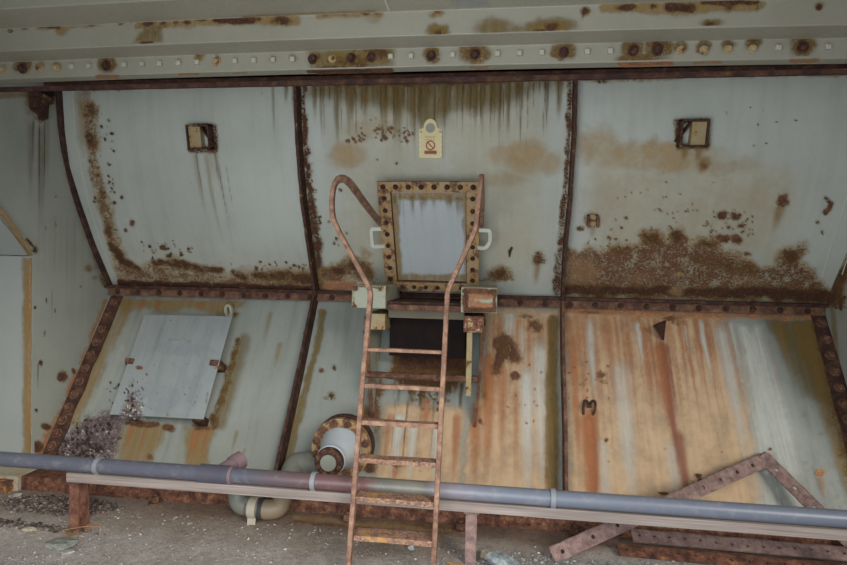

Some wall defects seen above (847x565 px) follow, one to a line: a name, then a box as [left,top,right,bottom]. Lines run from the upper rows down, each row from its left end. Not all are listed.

rust [135,16,299,44]
rust [307,49,394,75]
rust [481,20,572,33]
rust [601,0,763,26]
leakage [316,81,548,122]
rust [81,86,382,292]
rust [552,81,847,310]
rust [462,266,513,313]
rust [0,208,108,454]
rust [390,332,467,411]
rust [482,333,530,401]
rust [656,345,702,487]